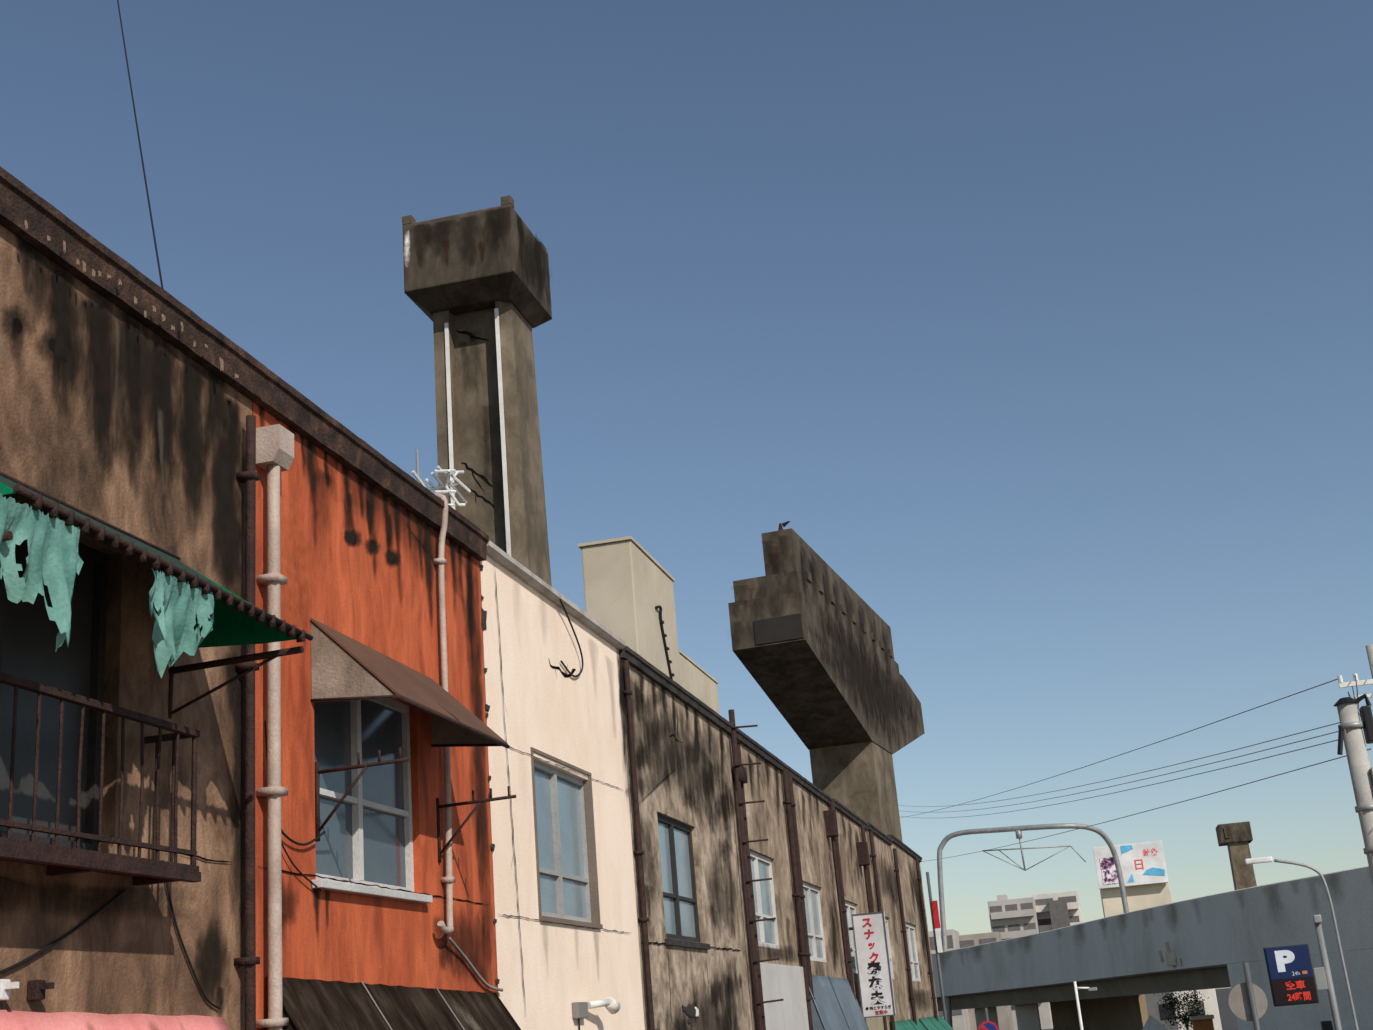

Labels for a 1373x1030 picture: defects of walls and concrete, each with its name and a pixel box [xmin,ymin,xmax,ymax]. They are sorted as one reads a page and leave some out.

damp [20,237,244,585]
damp [290,426,433,616]
crack [456,330,489,343]
crack [461,462,494,508]
damp [450,540,483,722]
damp [227,664,245,931]
crack [186,561,742,1023]
damp [476,747,488,880]
damp [617,650,725,820]
damp [312,888,329,927]
damp [881,862,925,956]
damp [668,977,741,1030]